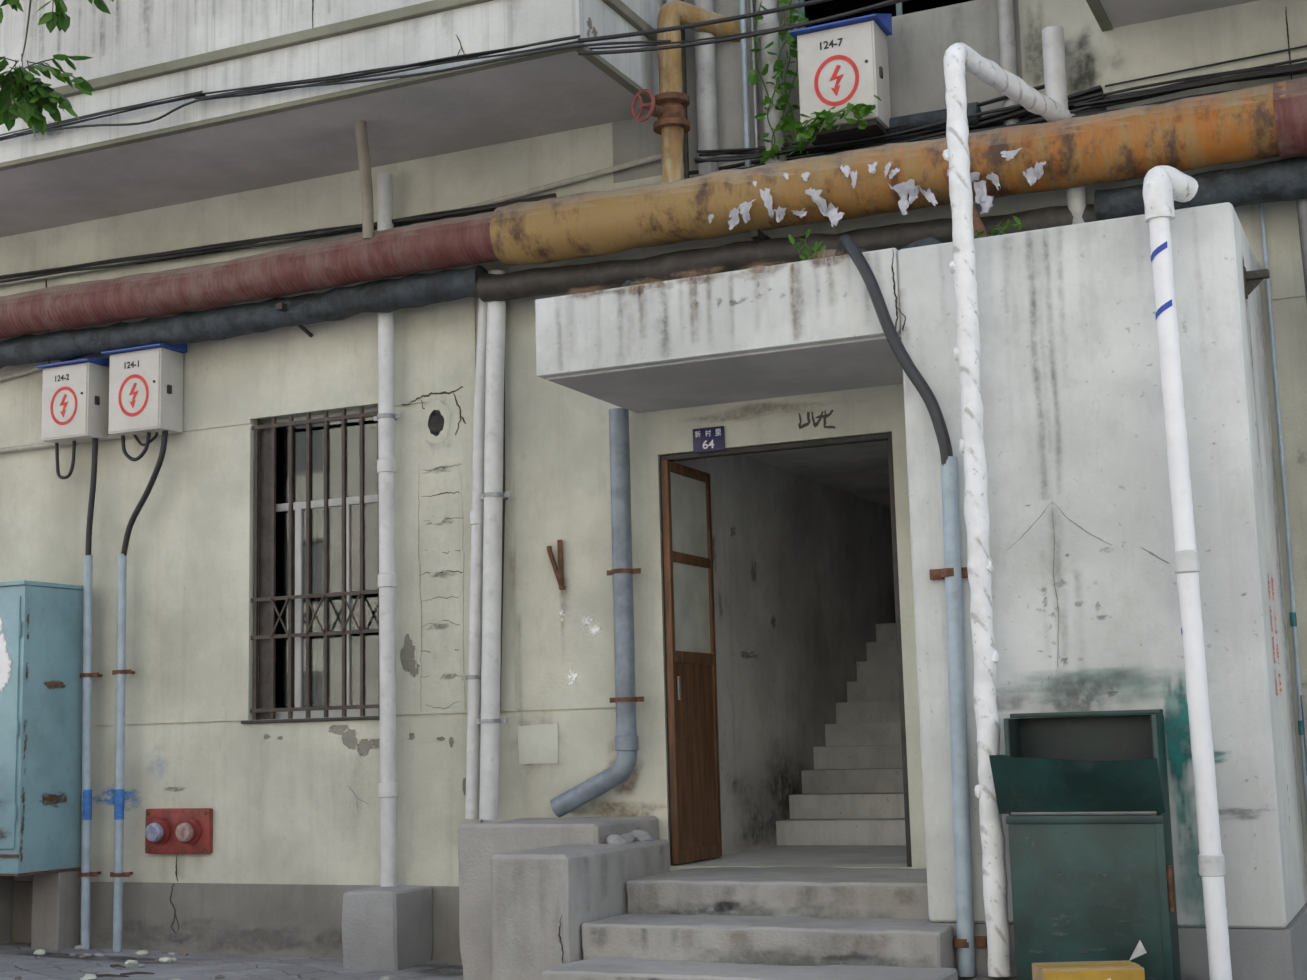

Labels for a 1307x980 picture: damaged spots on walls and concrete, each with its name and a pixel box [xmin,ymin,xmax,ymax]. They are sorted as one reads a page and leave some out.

damp [1072,41,1095,90]
crack [402,386,466,710]
spalling [400,632,420,678]
spalling [328,725,380,756]
crack [557,914,565,963]